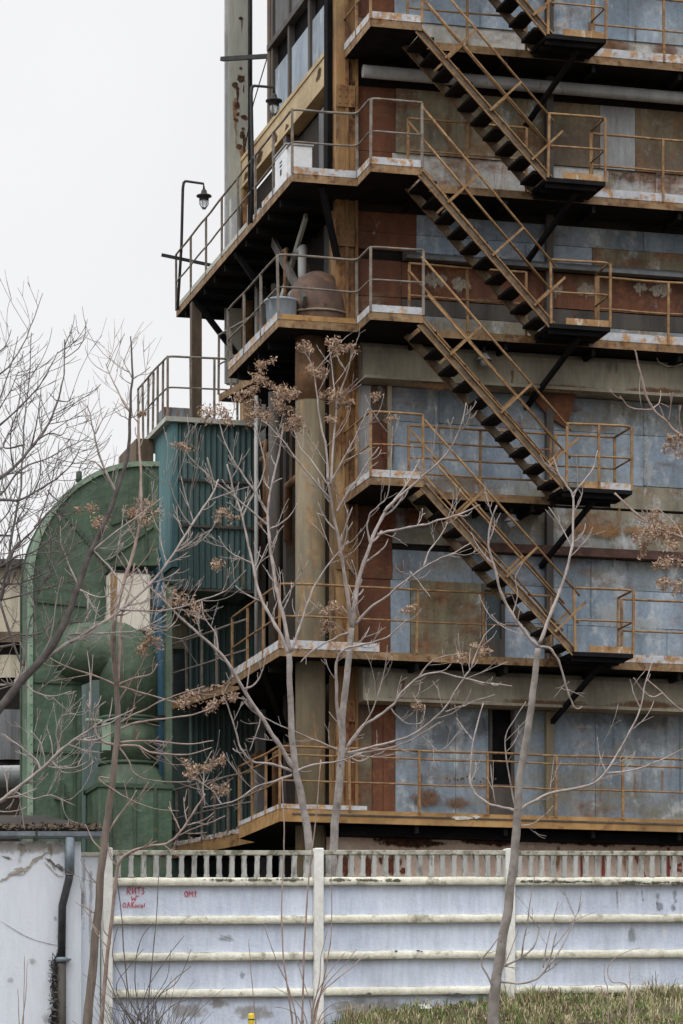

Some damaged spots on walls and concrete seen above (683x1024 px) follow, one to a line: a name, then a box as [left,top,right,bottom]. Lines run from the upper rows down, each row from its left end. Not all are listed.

rust [232,67,289,183]
peeling [633,282,672,298]
rust [576,508,683,538]
rust [412,775,469,808]
crack [0,852,65,882]